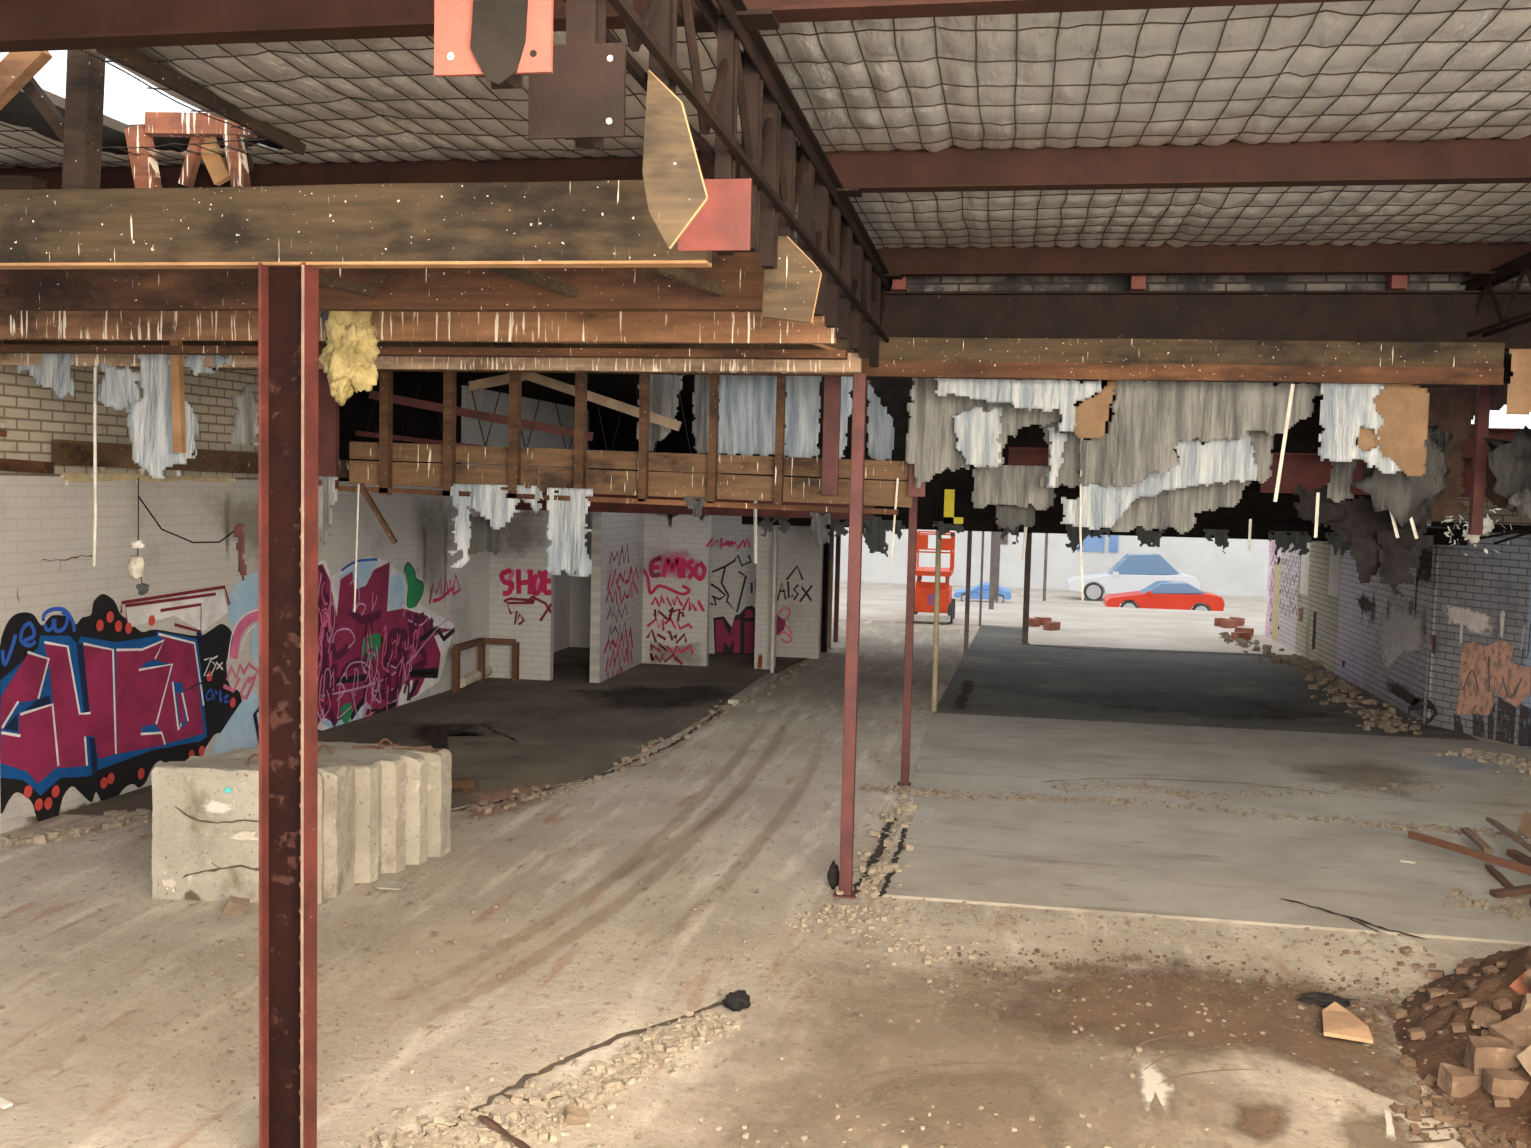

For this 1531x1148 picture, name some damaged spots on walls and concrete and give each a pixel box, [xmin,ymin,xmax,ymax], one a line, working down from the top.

crack [852,817,910,897]
crack [422,1002,723,1137]